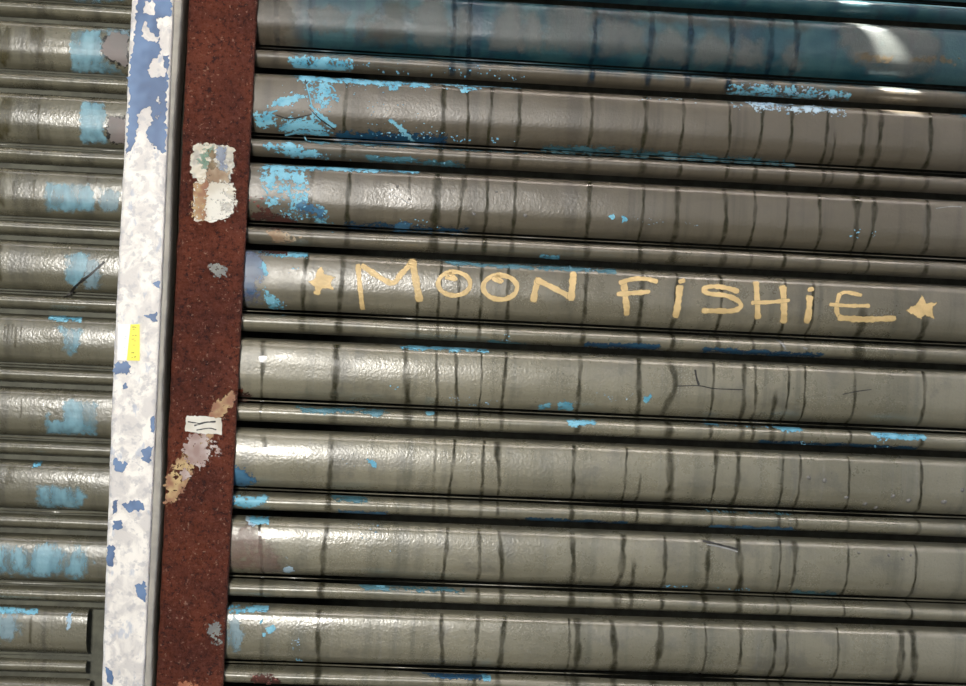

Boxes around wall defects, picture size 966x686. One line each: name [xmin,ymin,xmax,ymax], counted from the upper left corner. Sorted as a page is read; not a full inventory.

peeling [69,0,173,155]
peeling [253,55,527,235]
peeling [46,184,120,212]
peeling [65,252,99,291]
peeling [48,315,82,323]
peeling [112,361,131,389]
peeling [113,458,128,472]
peeling [141,446,154,463]
peeling [112,500,145,530]
peeling [106,545,116,567]
peeling [135,581,147,602]
peeling [0,607,38,640]